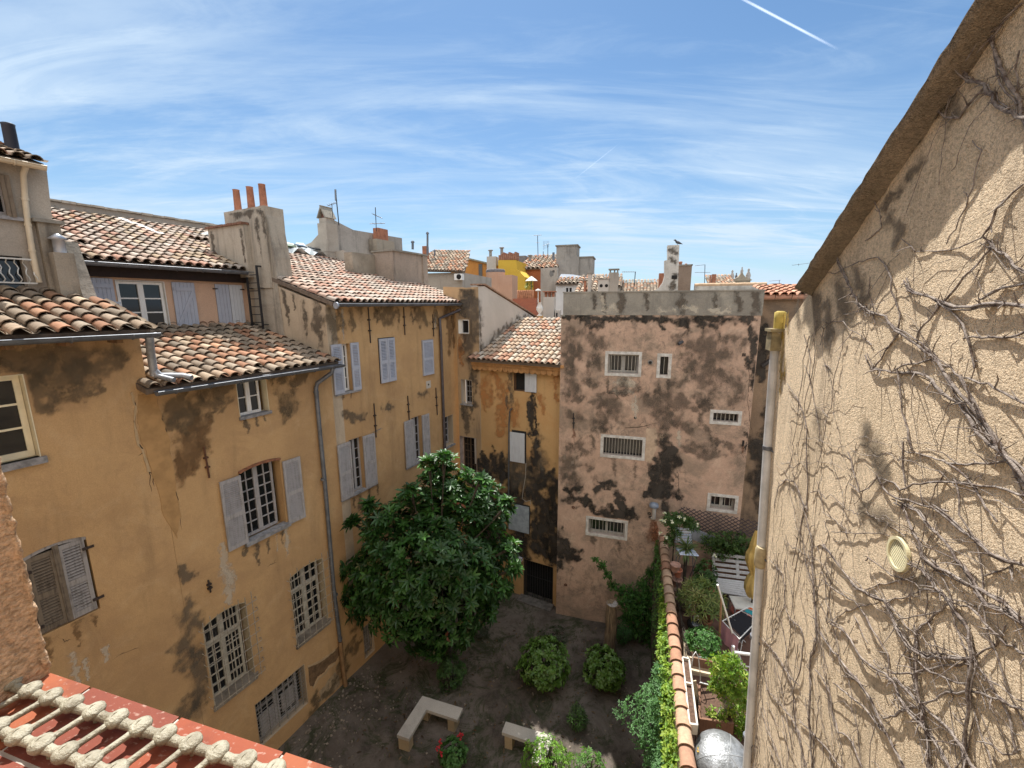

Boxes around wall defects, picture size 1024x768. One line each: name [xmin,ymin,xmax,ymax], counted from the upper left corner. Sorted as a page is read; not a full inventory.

leakage [0,344,129,414]
leakage [162,384,233,481]
leakage [466,249,769,573]